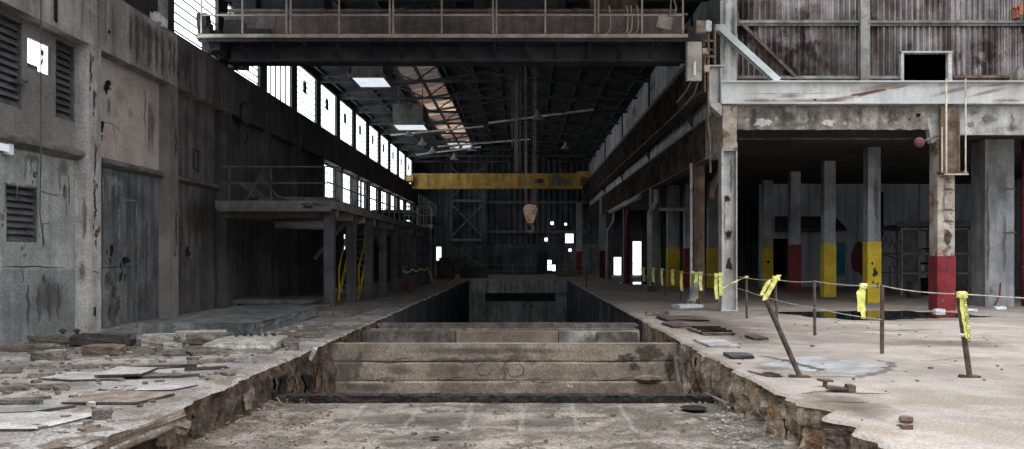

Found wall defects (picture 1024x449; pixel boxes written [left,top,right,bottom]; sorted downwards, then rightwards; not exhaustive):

spalling [89,53,126,320]
rust [784,85,903,126]
spalling [130,280,469,449]
spalling [567,280,883,449]